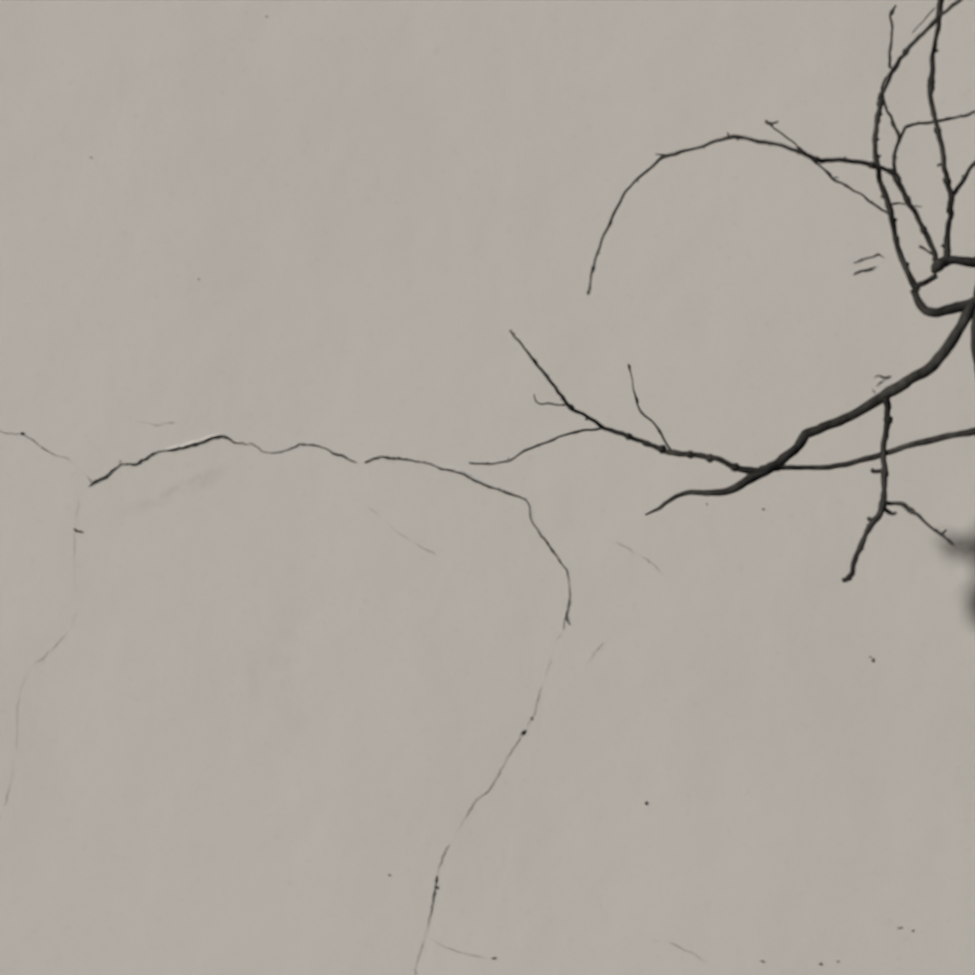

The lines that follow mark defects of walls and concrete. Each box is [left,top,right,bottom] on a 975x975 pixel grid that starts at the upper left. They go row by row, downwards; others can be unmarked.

crack [74,422,570,975]